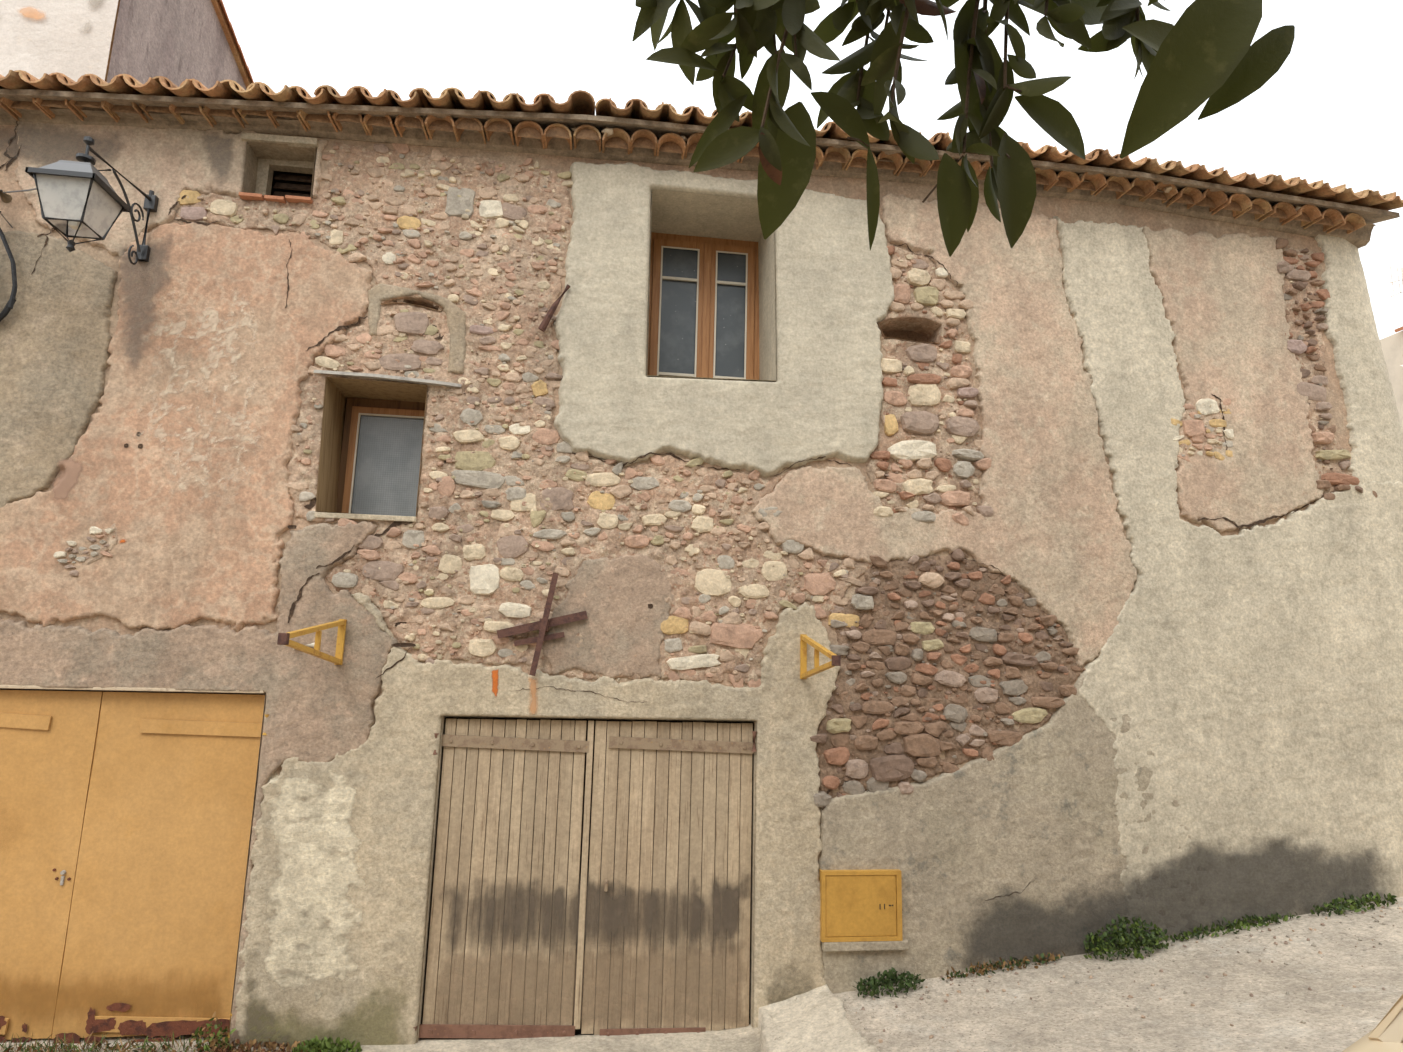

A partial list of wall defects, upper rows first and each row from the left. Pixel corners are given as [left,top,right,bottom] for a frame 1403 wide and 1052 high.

crack [284,240,292,308]
spalling [1276,238,1378,500]
spalling [1171,396,1234,462]
spalling [174,142,1086,807]
spalling [53,523,119,576]
crack [288,521,413,623]
rust [0,1016,32,1043]
rust [53,1003,230,1044]